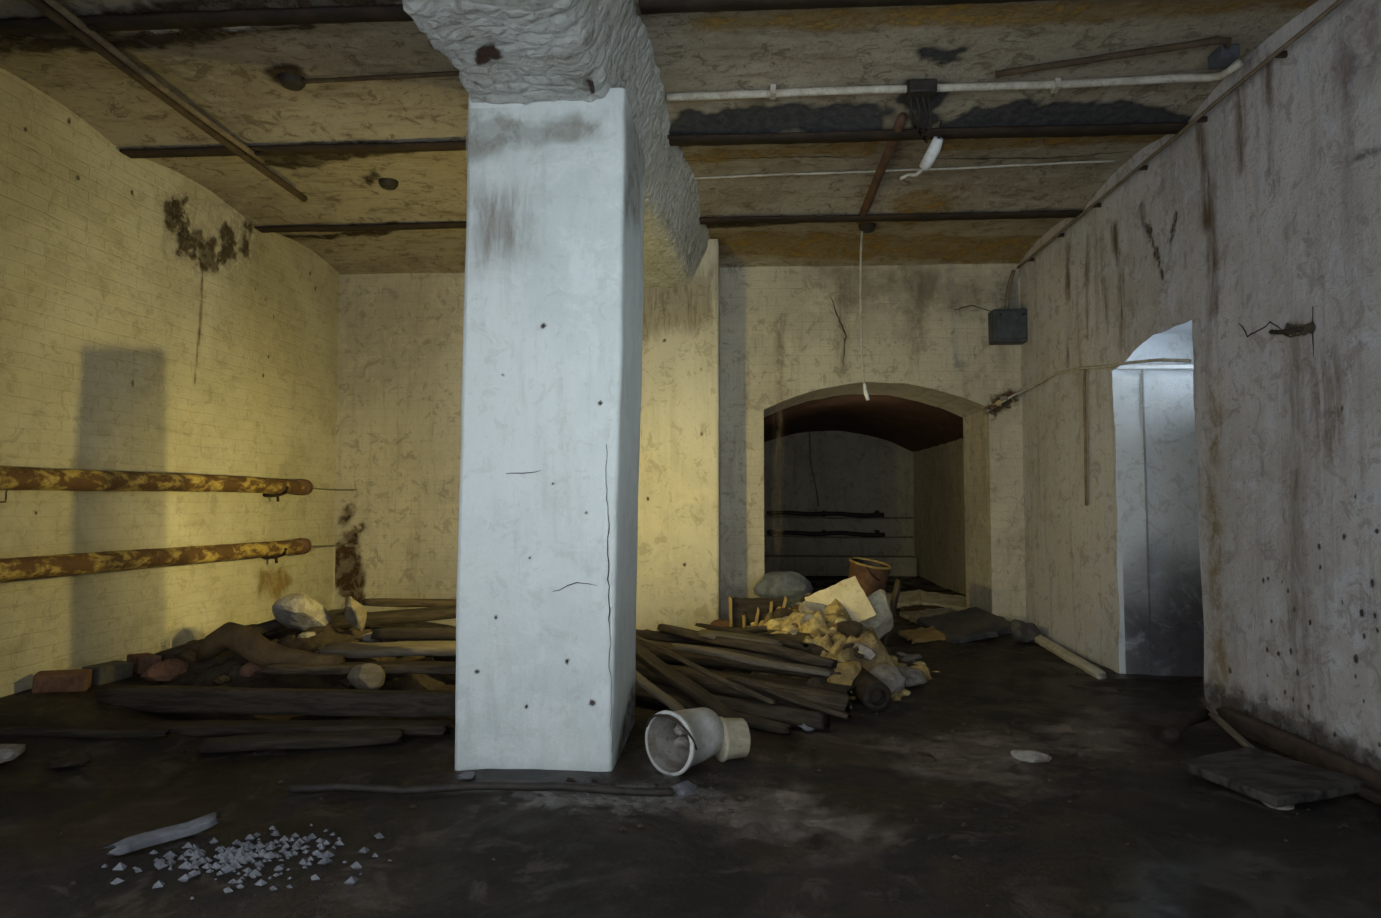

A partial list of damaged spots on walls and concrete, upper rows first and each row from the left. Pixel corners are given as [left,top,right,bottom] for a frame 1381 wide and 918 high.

water stain [767,0,1256,29]
water stain [917,48,967,65]
water stain [669,80,1203,164]